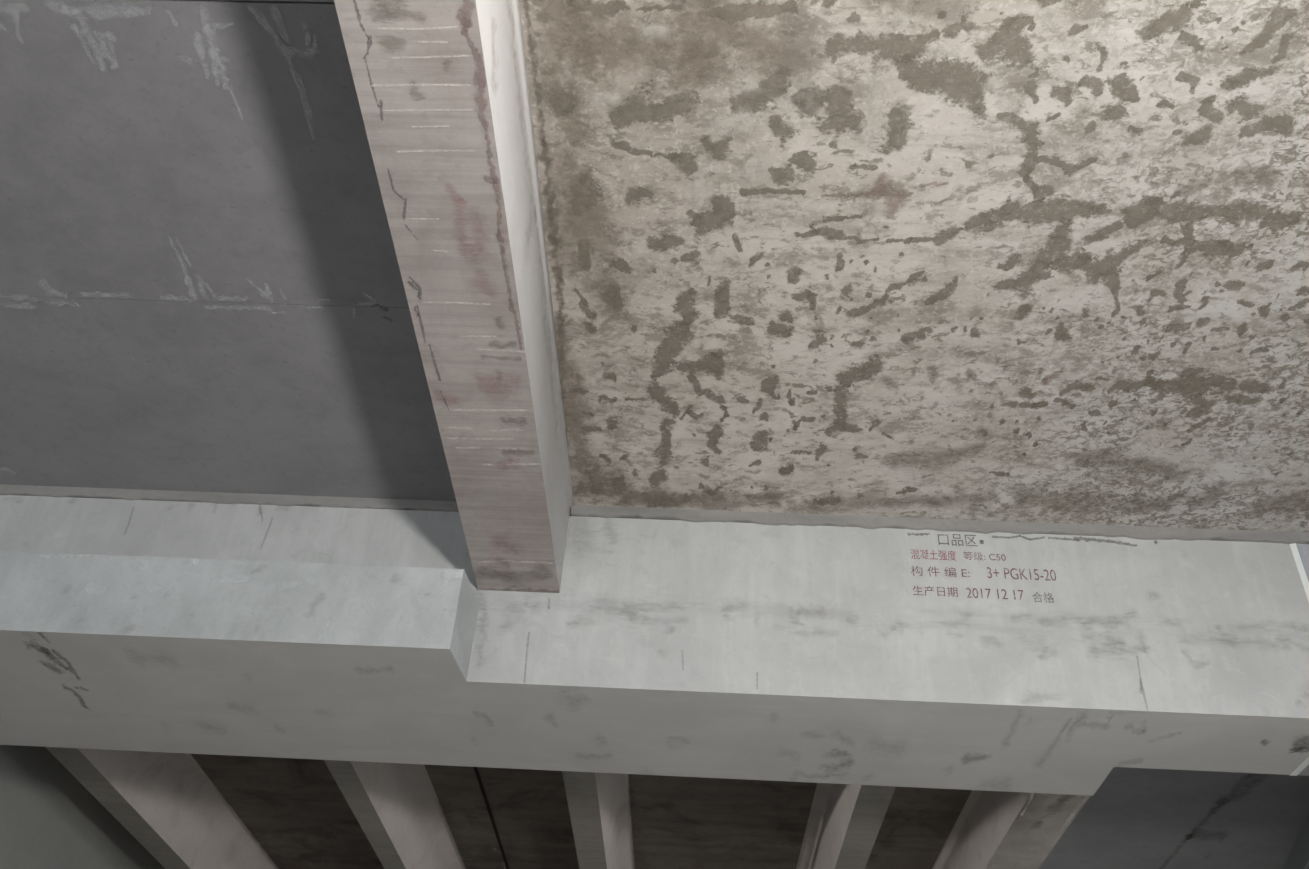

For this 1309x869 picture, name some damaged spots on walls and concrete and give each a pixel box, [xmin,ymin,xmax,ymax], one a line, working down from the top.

leakage [540,0,1309,331]
leakage [555,266,814,508]
leakage [779,354,892,474]
leakage [1059,366,1270,433]